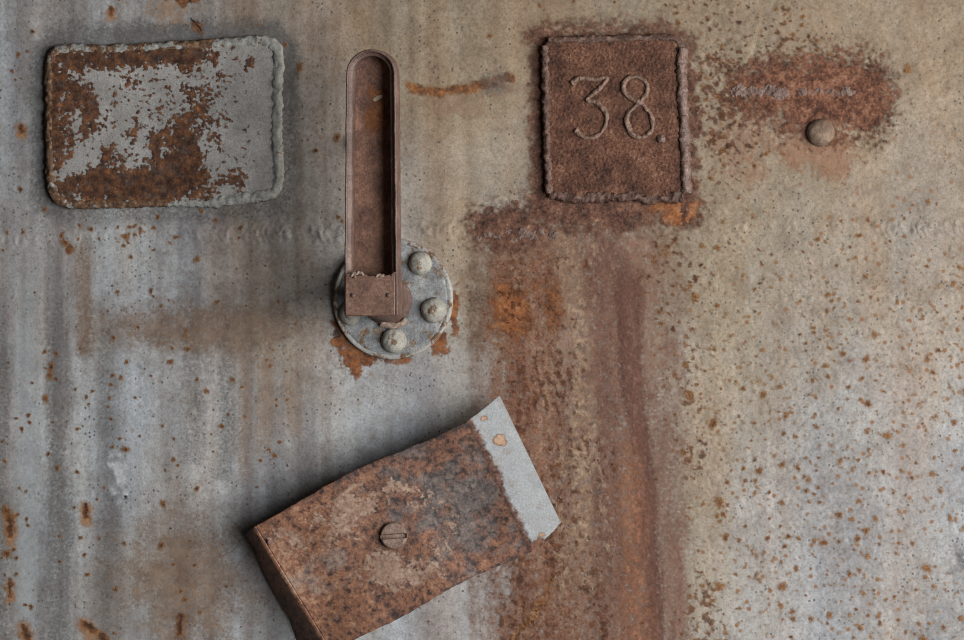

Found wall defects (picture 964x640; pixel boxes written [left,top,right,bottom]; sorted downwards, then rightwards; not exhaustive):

peeling [48,45,259,203]
rust [406,72,515,119]
rust [331,321,411,379]
rust [431,284,460,357]
rust [461,0,912,640]
rust [1,504,33,610]